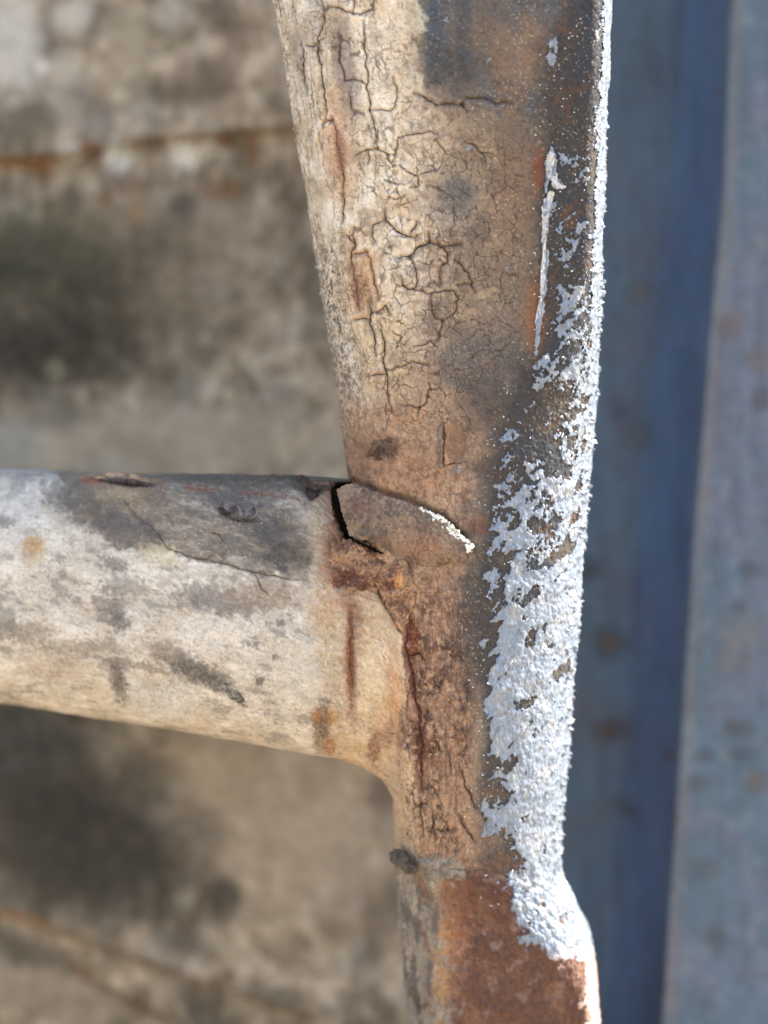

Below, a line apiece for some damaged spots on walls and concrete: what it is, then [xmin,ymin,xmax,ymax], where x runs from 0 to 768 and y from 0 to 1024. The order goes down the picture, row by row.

crack [302,0,508,413]
crack [124,501,290,595]
crack [331,486,383,554]
rust [386,573,403,590]